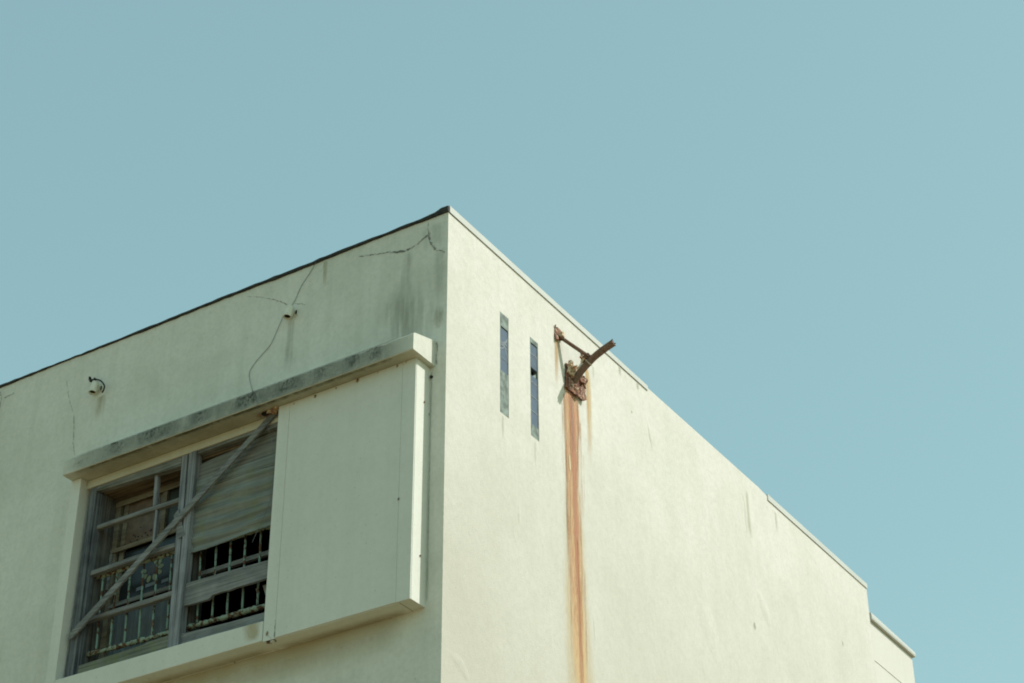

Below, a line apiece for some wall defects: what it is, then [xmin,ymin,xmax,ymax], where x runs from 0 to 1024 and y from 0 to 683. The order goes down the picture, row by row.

crack [360,233,443,257]
leakage [88,343,385,468]
rust [564,370,591,683]